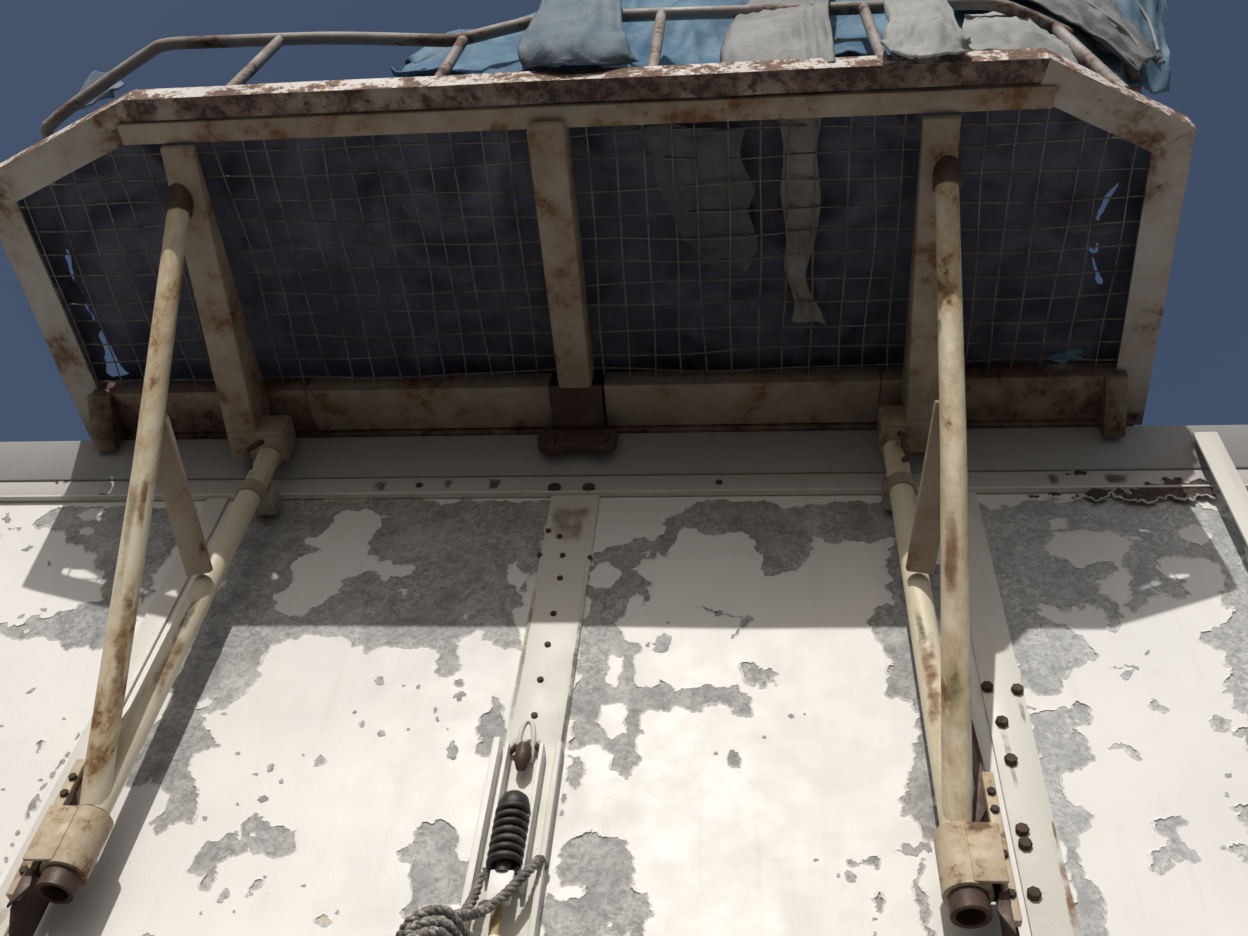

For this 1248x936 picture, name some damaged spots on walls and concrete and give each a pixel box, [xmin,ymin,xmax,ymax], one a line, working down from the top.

peeling [0,493,126,652]
rust [138,481,148,519]
rust [945,518,957,585]
rust [114,634,126,684]
peeling [124,498,551,836]
peeling [560,498,941,936]
rust [922,652,939,714]
peeling [978,470,1248,936]
peeling [186,795,298,913]
peeling [396,817,470,919]
peeling [540,828,655,936]